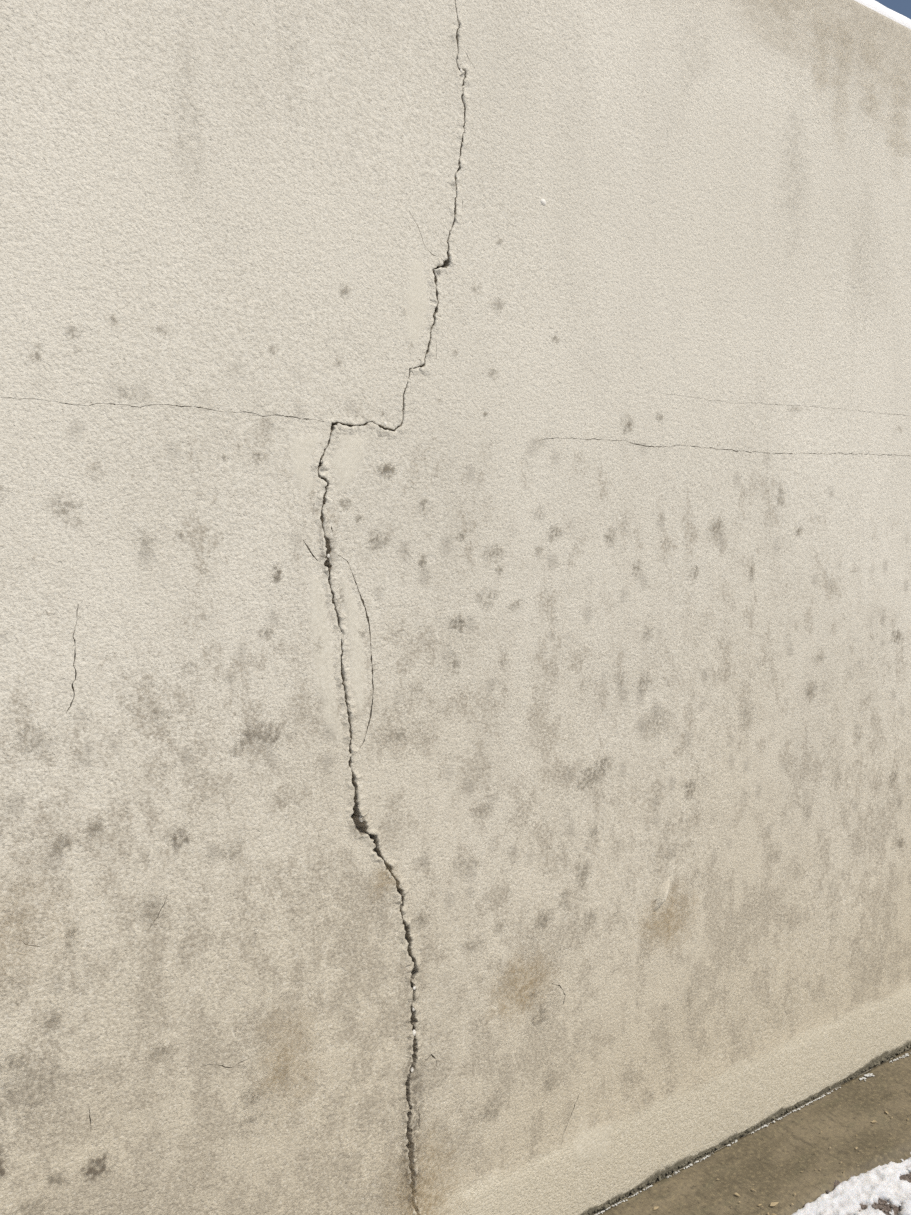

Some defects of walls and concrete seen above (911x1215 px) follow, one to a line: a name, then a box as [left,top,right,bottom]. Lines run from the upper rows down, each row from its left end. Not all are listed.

crack [4,0,475,1215]
damp [82,1156,107,1179]
damp [581,1041,911,1215]